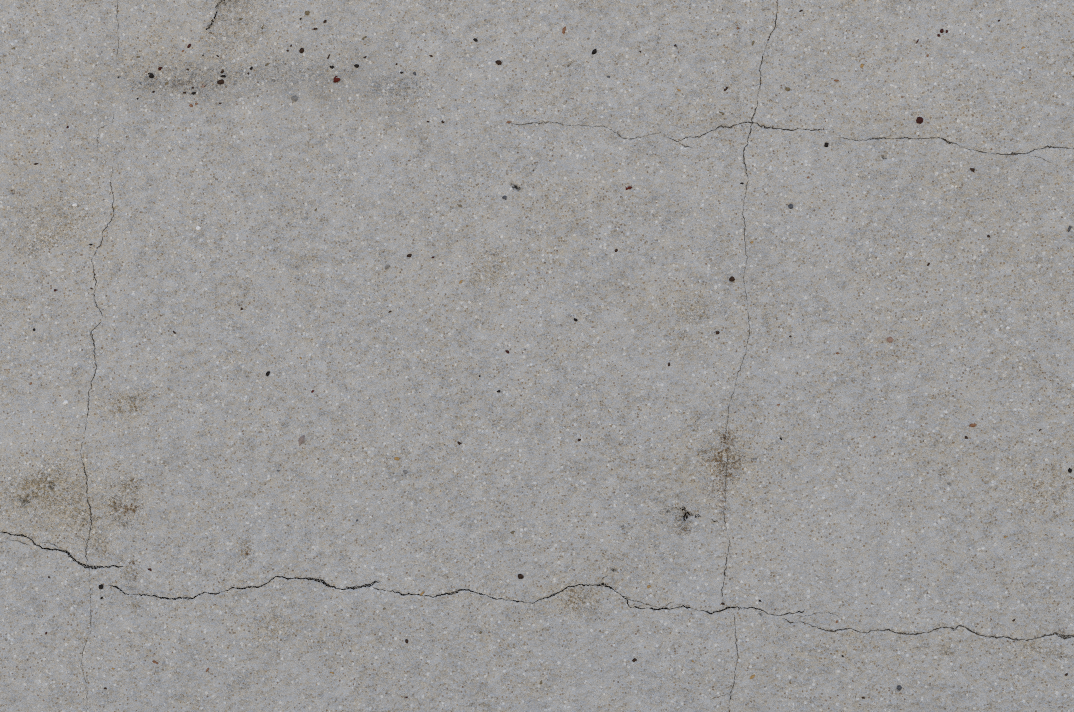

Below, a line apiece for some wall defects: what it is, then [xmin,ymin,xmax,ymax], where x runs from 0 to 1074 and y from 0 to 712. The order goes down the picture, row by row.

crack [746,0,778,87]
crack [3,167,124,698]
crack [109,102,1074,712]